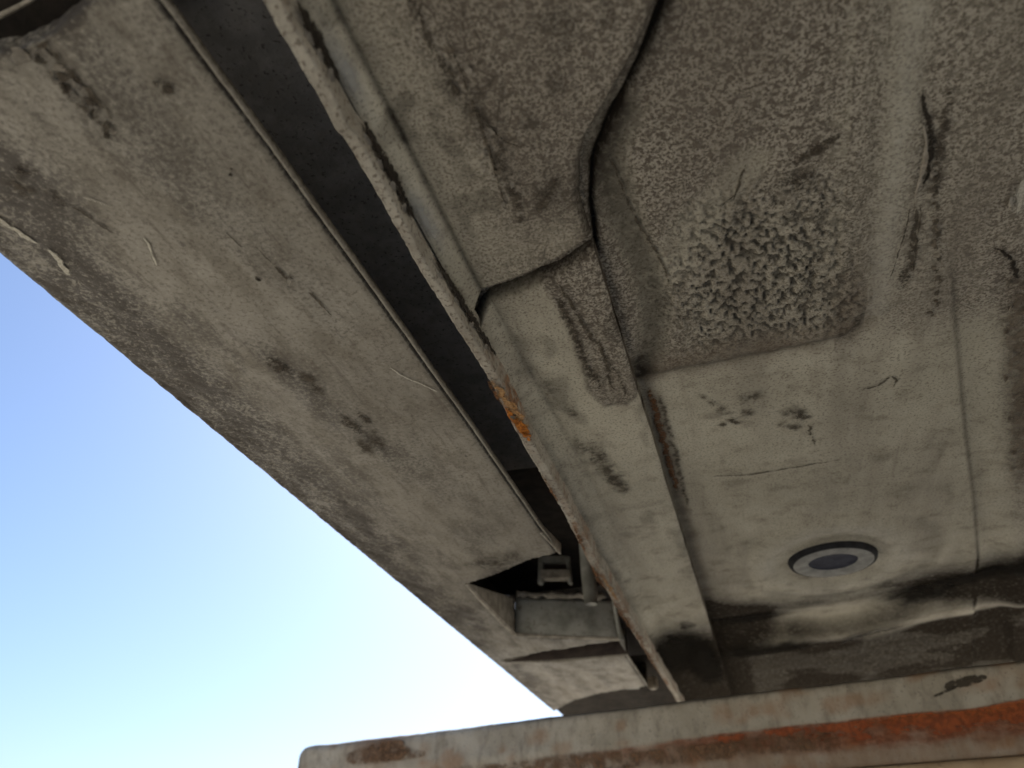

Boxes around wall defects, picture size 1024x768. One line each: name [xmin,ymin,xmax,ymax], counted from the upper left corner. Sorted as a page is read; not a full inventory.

crack [891,86,954,317]
leakage [341,413,384,453]
rust [488,381,531,441]
leakage [701,394,758,426]
leakage [778,410,815,444]
leakage [934,675,987,697]
rust [347,740,424,764]
rust [486,699,1024,768]